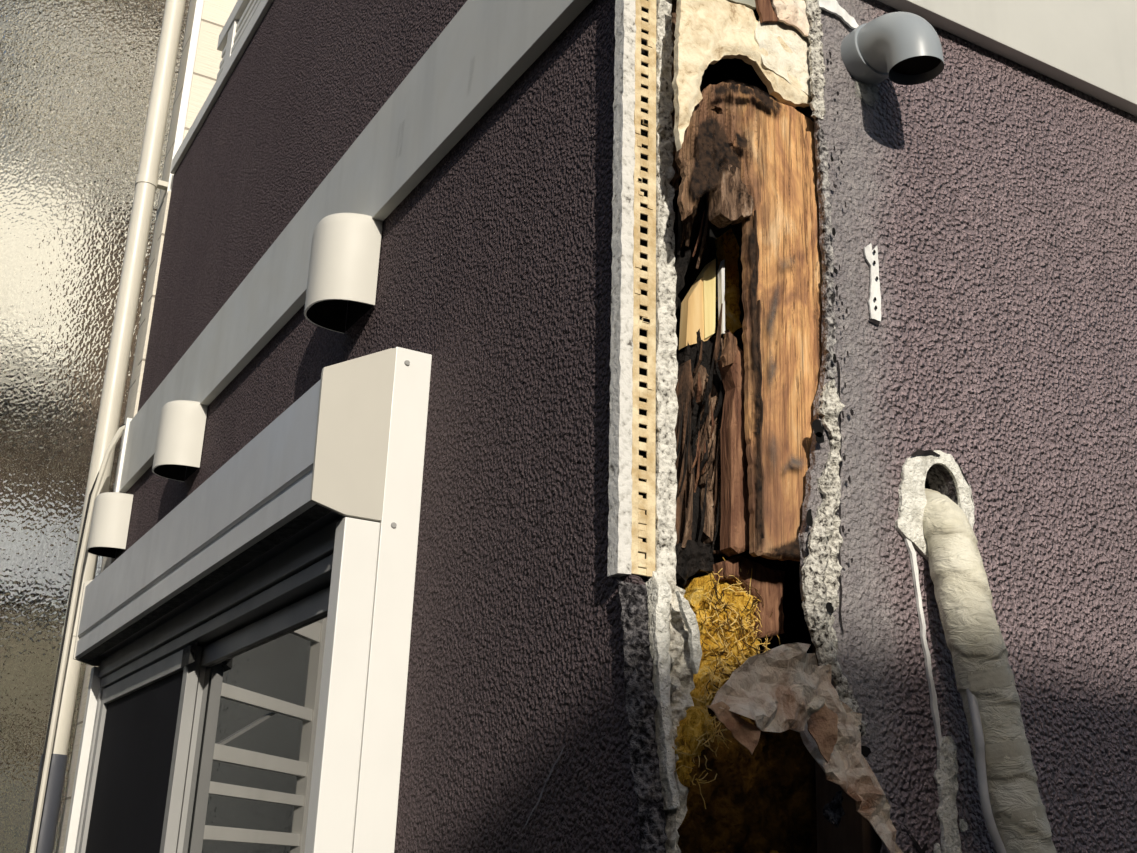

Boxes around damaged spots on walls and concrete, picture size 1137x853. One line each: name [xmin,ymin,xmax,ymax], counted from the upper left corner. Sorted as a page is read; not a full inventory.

flaking render [801,0,871,757]
spalling [895,449,975,562]
flaking render [617,570,702,853]